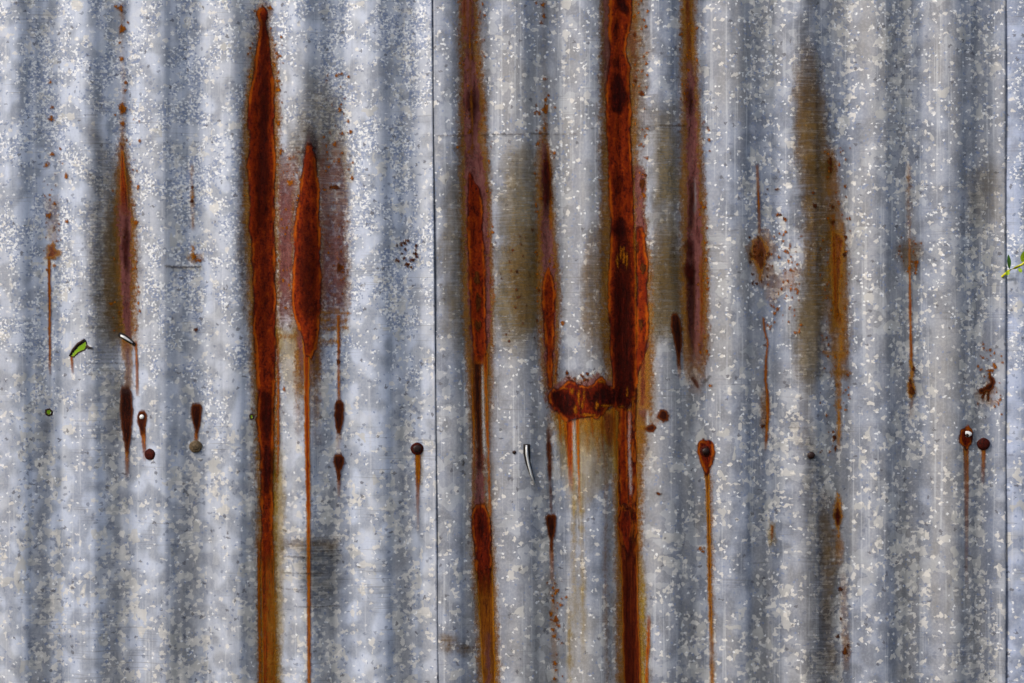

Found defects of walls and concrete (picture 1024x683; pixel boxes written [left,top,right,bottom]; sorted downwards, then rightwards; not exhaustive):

corrosion [94,81,147,467]
corrosion [190,403,202,440]
corrosion [240,5,354,683]
corrosion [444,0,500,683]
corrosion [534,0,669,683]
corrosion [671,0,712,387]
corrosion [697,438,715,683]
corrosion [958,425,986,501]
corrosion [977,343,1004,415]